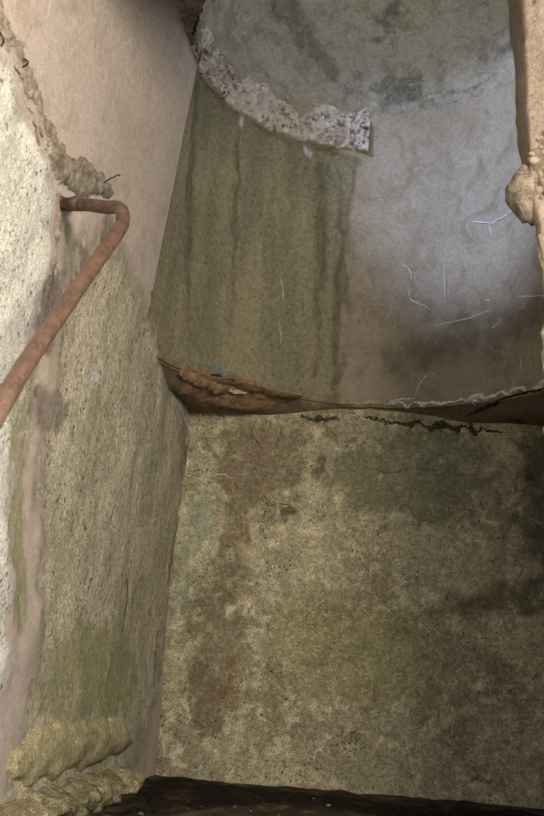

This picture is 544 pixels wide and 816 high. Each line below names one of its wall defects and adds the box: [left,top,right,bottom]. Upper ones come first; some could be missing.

spalling [189,8,371,153]
peeling [0,0,114,386]
flaking render [528,129,544,200]
spalling [536,234,544,300]
spalling [178,363,305,413]
damp [301,414,339,423]
peeling [0,378,34,700]
damp [188,423,306,733]